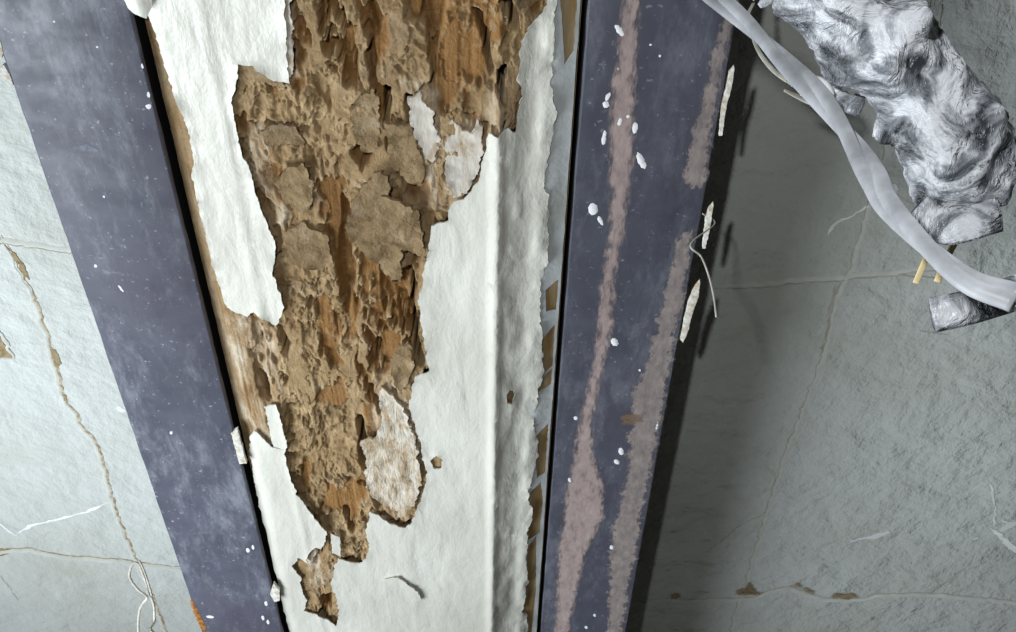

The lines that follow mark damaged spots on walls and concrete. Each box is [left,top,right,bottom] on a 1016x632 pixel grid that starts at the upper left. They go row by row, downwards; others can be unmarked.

peeling [238,64,287,96]
peeling [274,162,334,273]
peeling [546,280,558,311]
crack [715,266,936,314]
spalling [0,332,15,360]
peeling [390,340,415,393]
peeling [538,325,555,392]
crack [0,237,181,632]
peeling [231,427,247,464]
peeling [522,424,548,632]
peeling [270,581,280,602]
crack [641,586,1016,605]